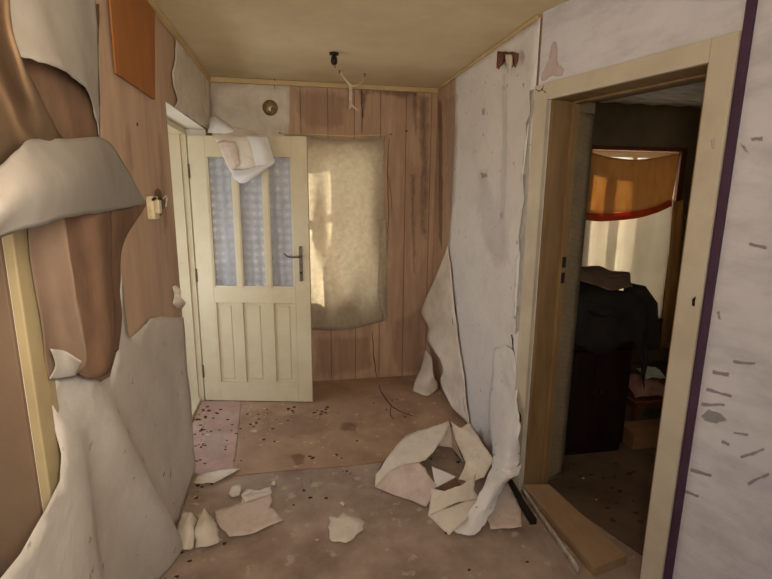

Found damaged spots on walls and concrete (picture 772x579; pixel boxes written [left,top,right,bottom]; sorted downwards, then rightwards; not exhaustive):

peeling [172,284,186,309]